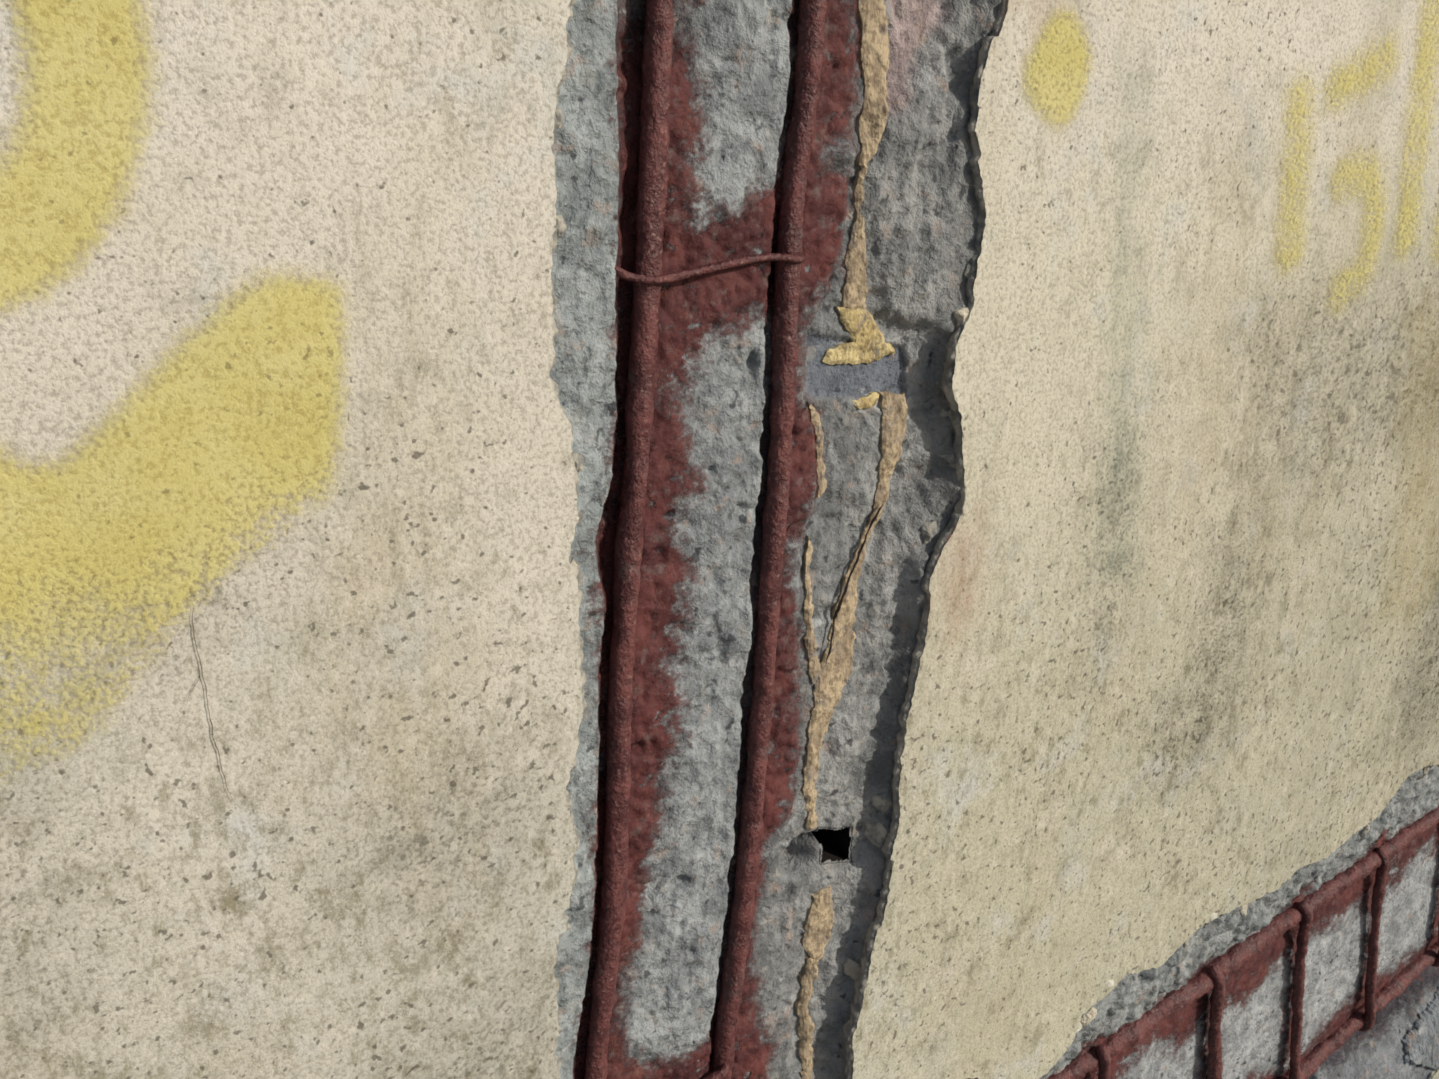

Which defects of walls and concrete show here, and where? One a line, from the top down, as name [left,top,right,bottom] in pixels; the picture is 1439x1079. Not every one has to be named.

spalling [549,0,646,1079]
corrosion [573,16,644,1079]
corrosion [606,34,785,1079]
spalling [607,0,800,1078]
corrosion [731,0,861,1079]
crack [825,500,884,666]
spalling [734,0,1009,1079]
spalling [1039,765,1439,1079]
corrosion [1075,810,1439,1079]